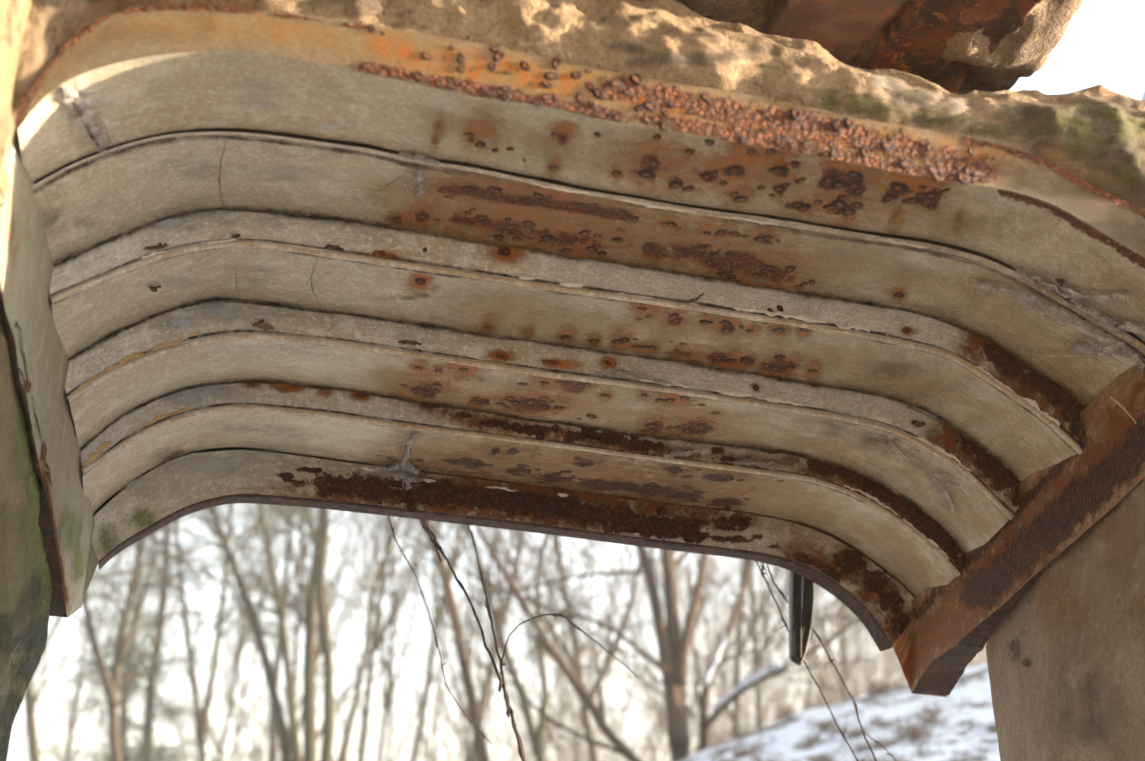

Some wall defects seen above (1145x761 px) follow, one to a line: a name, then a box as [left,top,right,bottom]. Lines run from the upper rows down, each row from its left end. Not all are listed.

corrosion [14,5,322,127]
crack [219,140,227,209]
corrosion [385,173,816,291]
corrosion [342,22,1145,269]
corrosion [247,381,304,392]
corrosion [555,303,822,392]
corrosion [891,287,907,301]
corrosion [277,331,1145,688]